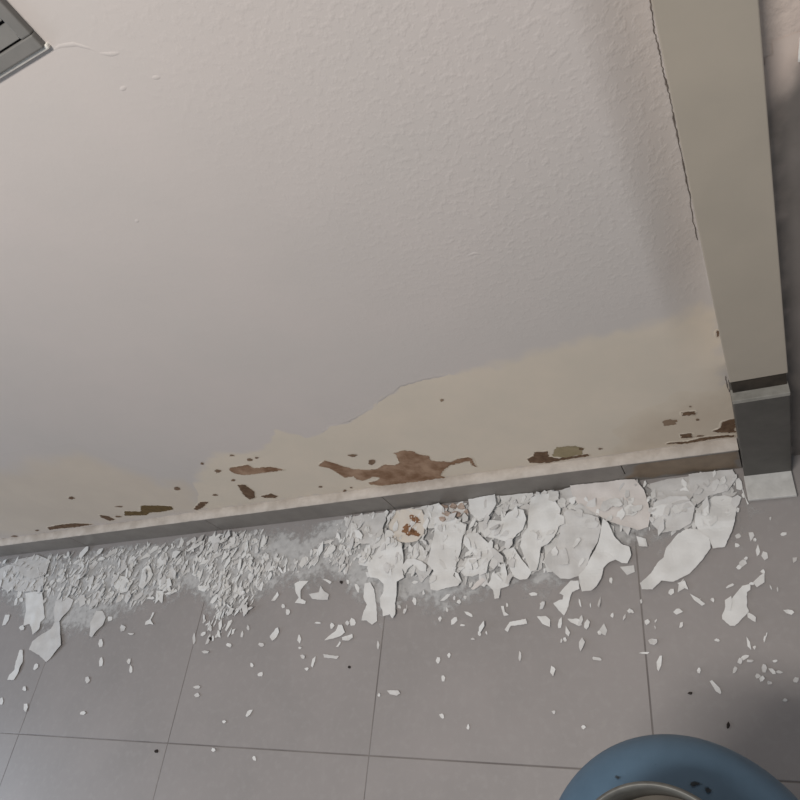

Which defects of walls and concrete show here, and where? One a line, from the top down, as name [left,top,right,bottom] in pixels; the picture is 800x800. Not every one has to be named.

crack [649,0,698,240]
flaking render [35,522,93,531]
leakage [0,442,208,538]
peeling [99,288,737,521]
leakage [552,446,584,458]
leakage [594,383,737,457]